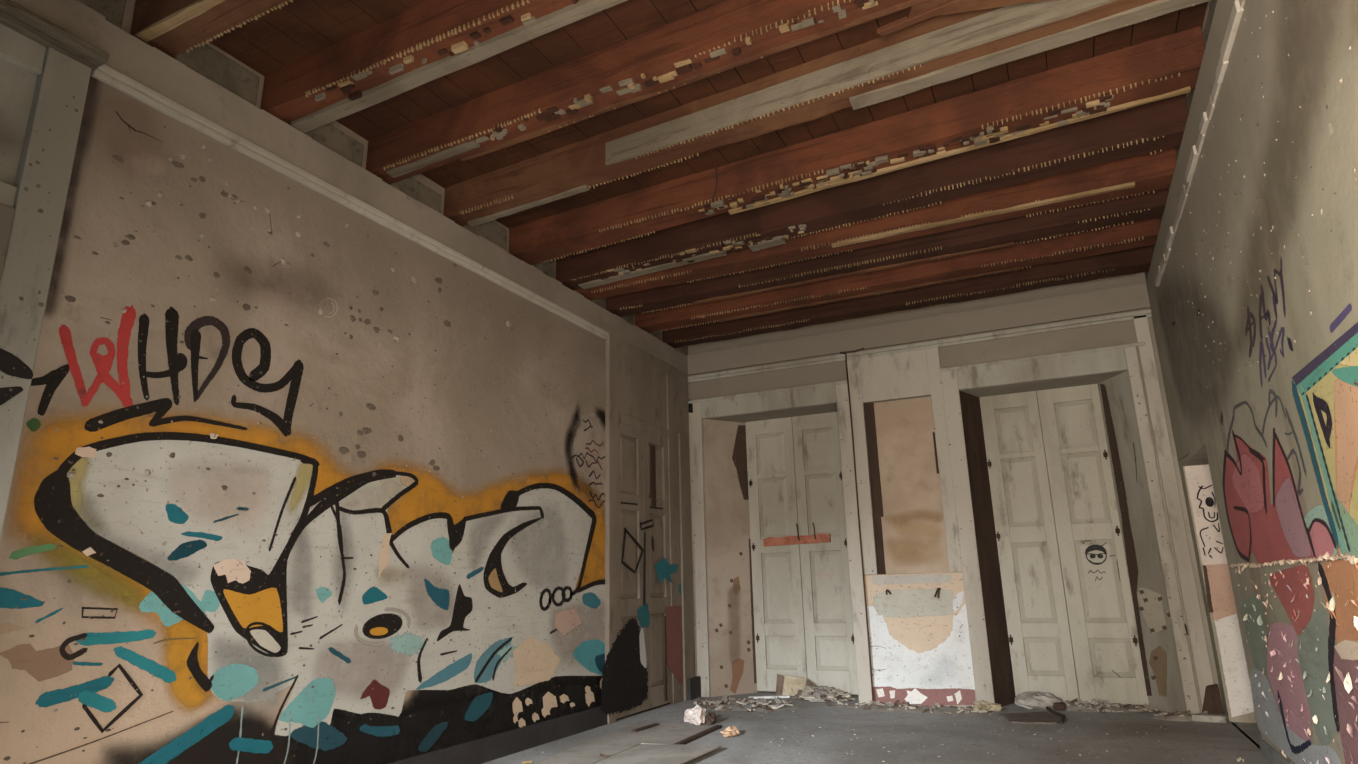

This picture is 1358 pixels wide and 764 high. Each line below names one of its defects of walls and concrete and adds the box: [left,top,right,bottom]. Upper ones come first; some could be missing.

crack [116,111,162,142]
peeling [872,670,928,704]